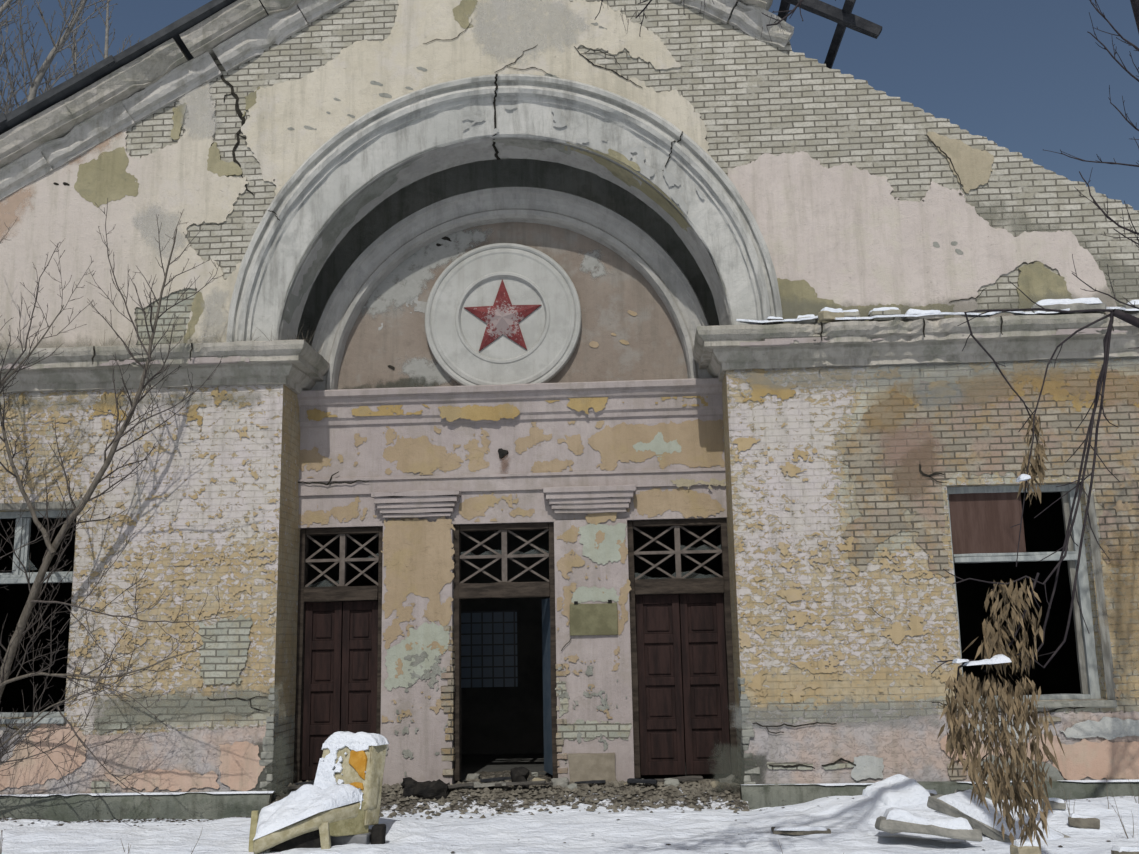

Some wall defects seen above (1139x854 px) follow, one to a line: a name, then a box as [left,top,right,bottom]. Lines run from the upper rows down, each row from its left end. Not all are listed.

flaking render [53,101,189,208]
crack [220,74,280,221]
flaking render [186,0,399,280]
crack [492,44,553,160]
crack [574,46,642,88]
flaking render [569,0,1139,314]
flaking render [777,278,955,323]
crack [298,471,369,485]
flaking render [514,358,1139,713]
peeling [298,492,535,776]
crack [753,722,836,734]
crack [769,758,856,769]